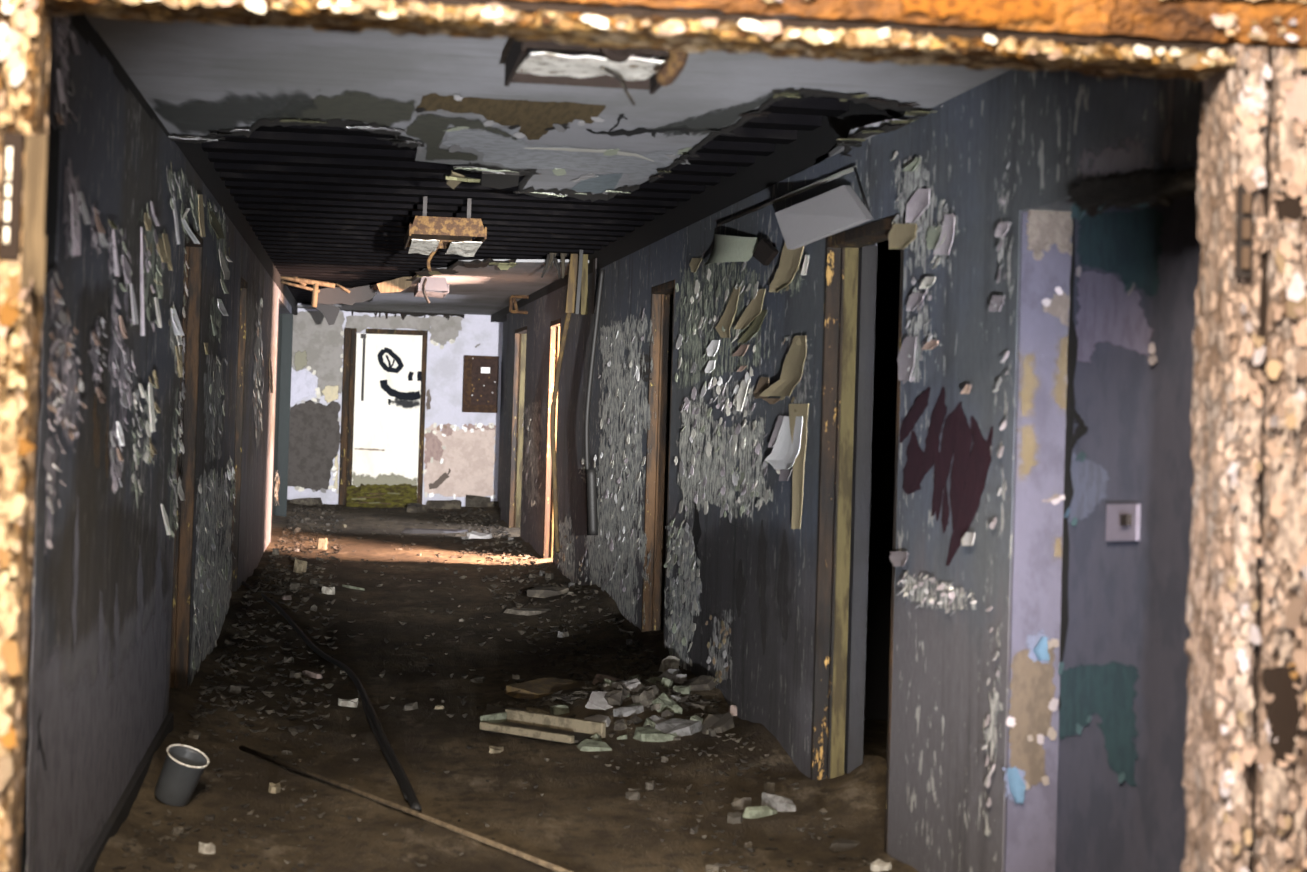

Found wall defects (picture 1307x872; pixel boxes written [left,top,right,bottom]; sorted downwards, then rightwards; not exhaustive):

flaking render [406,93,693,195]
peeling [888,151,965,384]
flaking render [274,303,463,505]
flaking render [423,390,496,499]
peeling [522,400,545,524]
peeling [553,243,813,688]
peeling [961,349,1011,546]
peeling [889,551,993,615]
flaking render [982,624,1140,838]